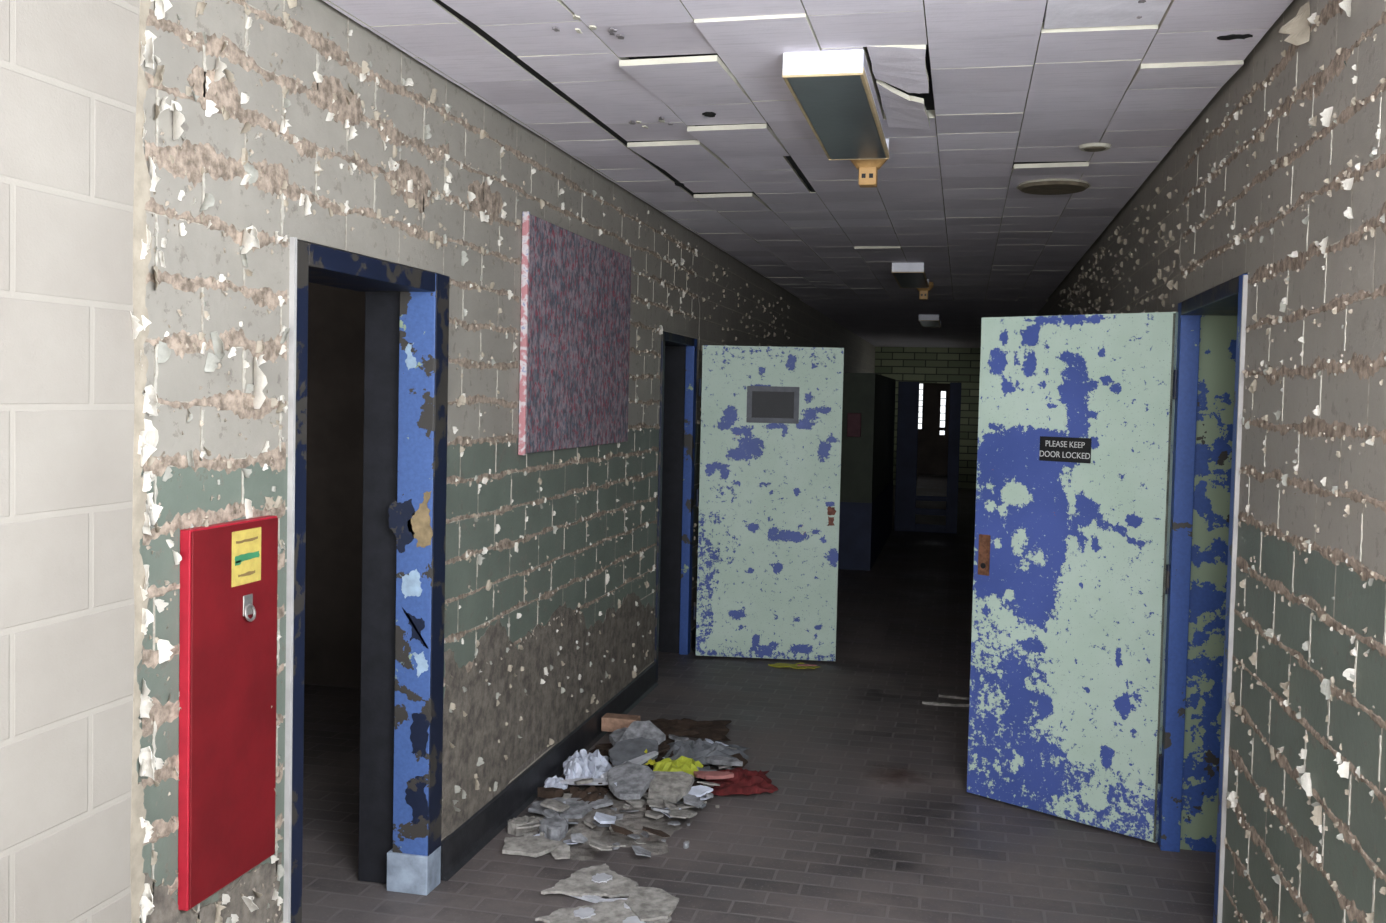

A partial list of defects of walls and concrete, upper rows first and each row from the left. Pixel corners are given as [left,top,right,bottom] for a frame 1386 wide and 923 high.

peeling [1058,0,1386,923]